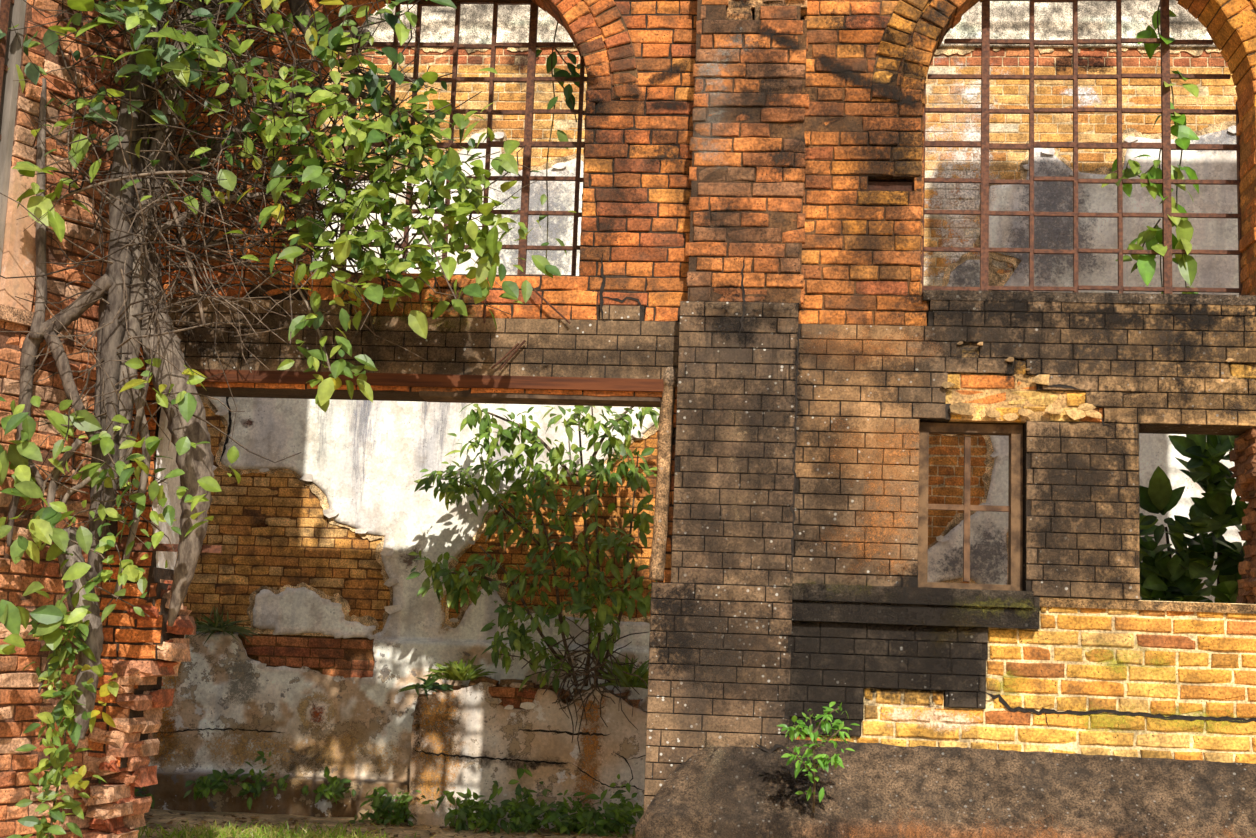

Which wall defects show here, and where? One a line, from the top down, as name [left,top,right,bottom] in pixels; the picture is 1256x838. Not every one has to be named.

water stain [962,80,981,108]
water stain [1065,88,1099,105]
water stain [649,124,1256,739]
flaking render [928,357,1103,546]
peeling [183,402,402,684]
water stain [152,661,193,767]
water stain [225,660,259,703]
water stain [207,692,563,805]
water stain [574,695,606,807]
water stain [696,750,822,838]
crack [980,692,1256,727]